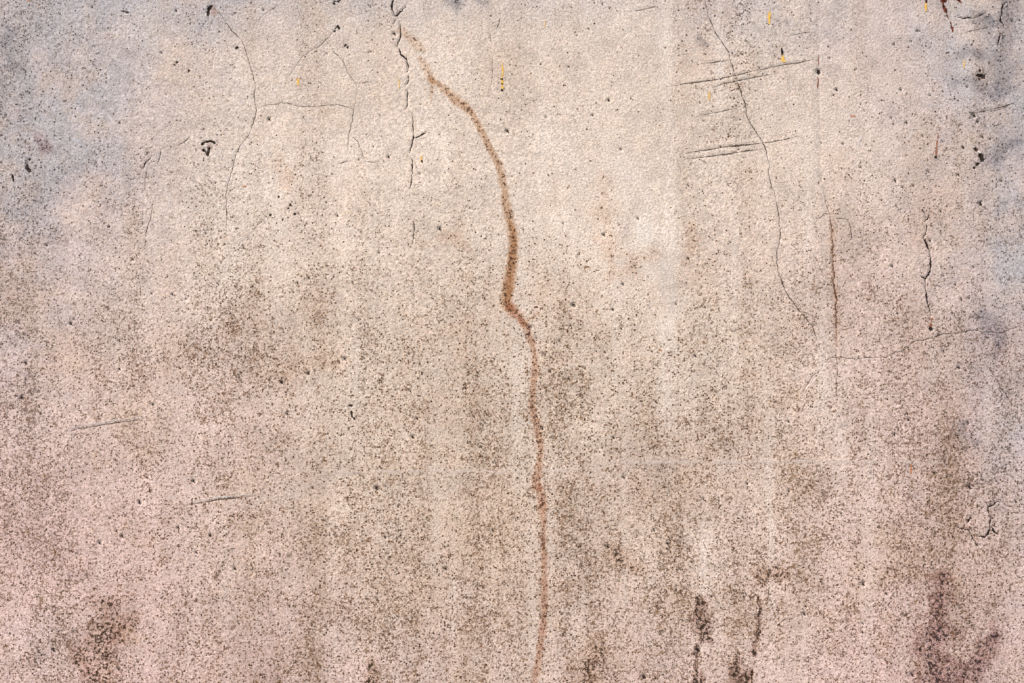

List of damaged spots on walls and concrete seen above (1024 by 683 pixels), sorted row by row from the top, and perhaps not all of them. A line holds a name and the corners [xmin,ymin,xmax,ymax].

crack [220,6,379,225]
crack [390,0,425,186]
rust [405,32,545,507]
crack [705,1,1014,394]
leakage [690,595,714,683]
leakage [729,657,753,683]
leakage [911,568,1001,683]